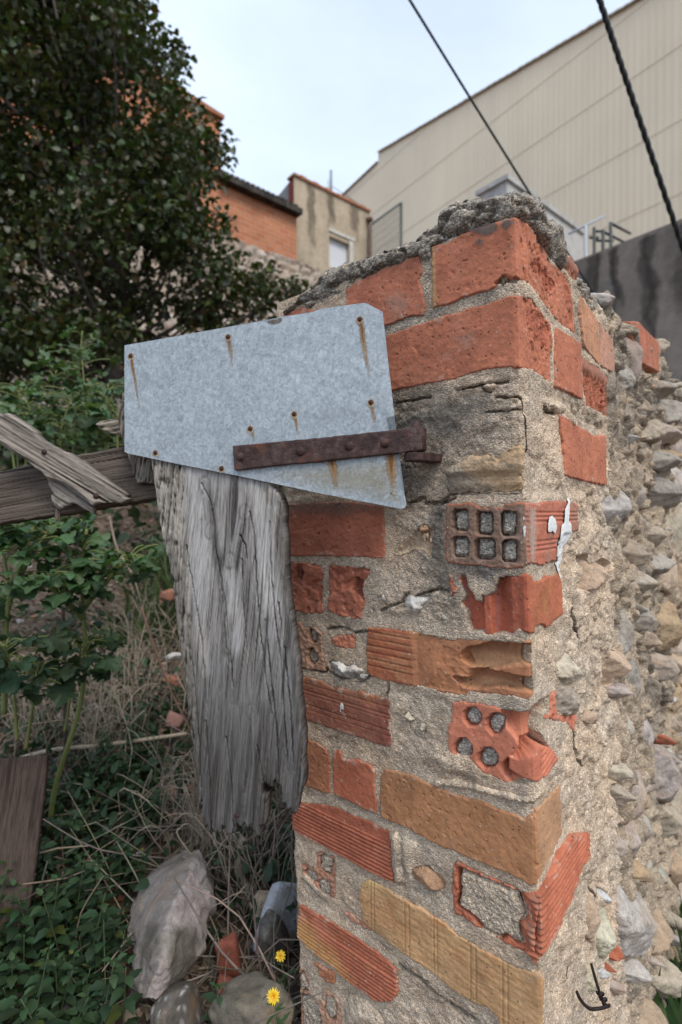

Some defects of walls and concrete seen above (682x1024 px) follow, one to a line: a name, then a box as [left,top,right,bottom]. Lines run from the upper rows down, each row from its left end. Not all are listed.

damp [587,247,621,305]
damp [640,234,658,322]